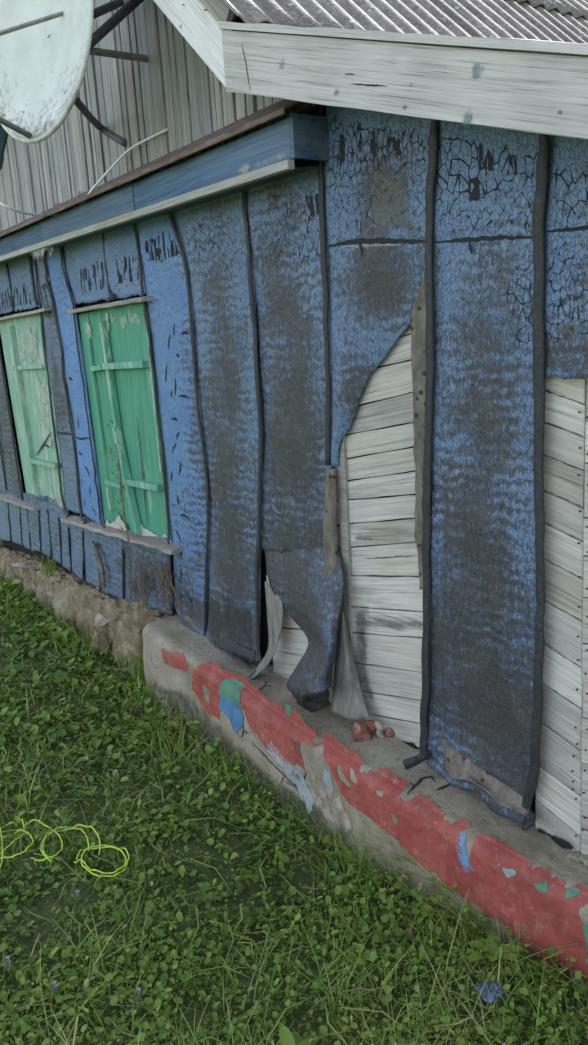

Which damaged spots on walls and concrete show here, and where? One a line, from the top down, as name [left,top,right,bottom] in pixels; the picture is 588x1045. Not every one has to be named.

crack [187,159,428,278]
crack [450,177,588,348]
peeling [161,649,588,984]